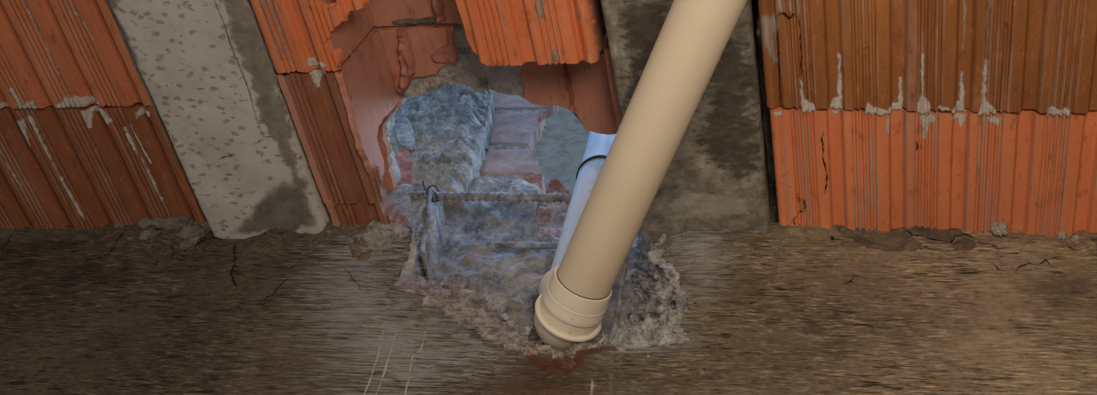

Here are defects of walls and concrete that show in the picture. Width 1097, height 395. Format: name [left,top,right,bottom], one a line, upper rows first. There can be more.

peeling [396,117,416,150]
crack [195,236,237,286]
spalling [326,179,694,362]
crack [903,229,1095,273]